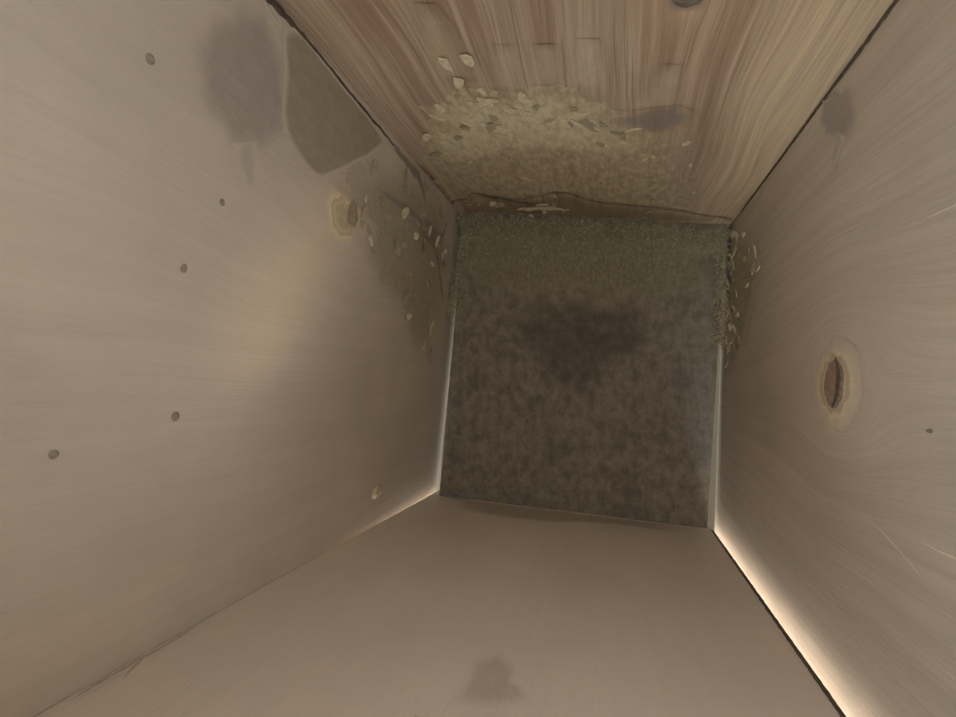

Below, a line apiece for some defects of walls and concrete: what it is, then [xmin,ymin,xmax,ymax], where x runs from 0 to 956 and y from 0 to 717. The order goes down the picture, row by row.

leakage [186,0,728,374]
leakage [486,286,672,412]